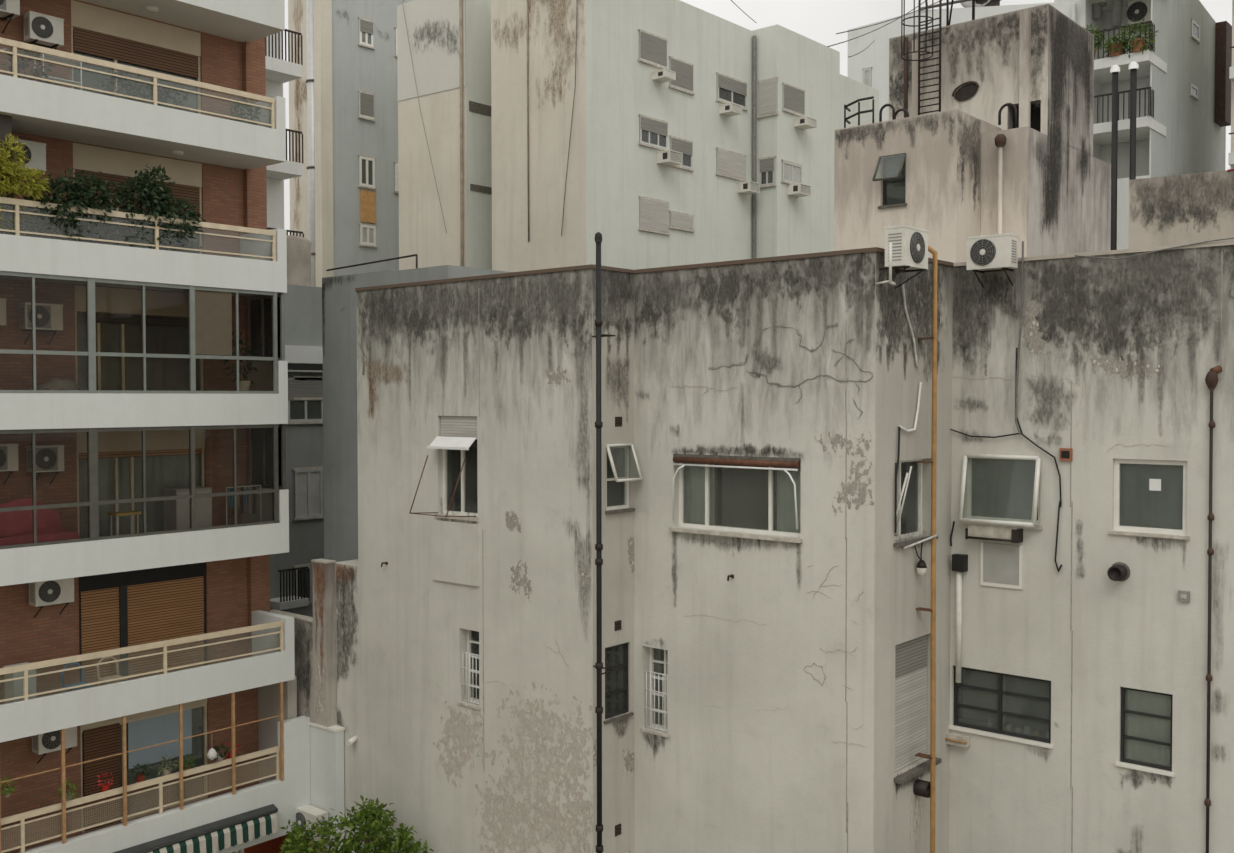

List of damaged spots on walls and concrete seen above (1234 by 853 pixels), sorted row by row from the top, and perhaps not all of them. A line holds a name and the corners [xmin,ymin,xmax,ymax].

damp [838,124,888,147]
damp [889,39,912,108]
damp [951,14,1092,224]
damp [1138,175,1234,224]
damp [357,253,1017,398]
crack [673,324,873,417]
damp [1031,383,1069,421]
damp [1031,245,1234,396]
peeling [815,432,874,516]
peeling [433,684,597,853]